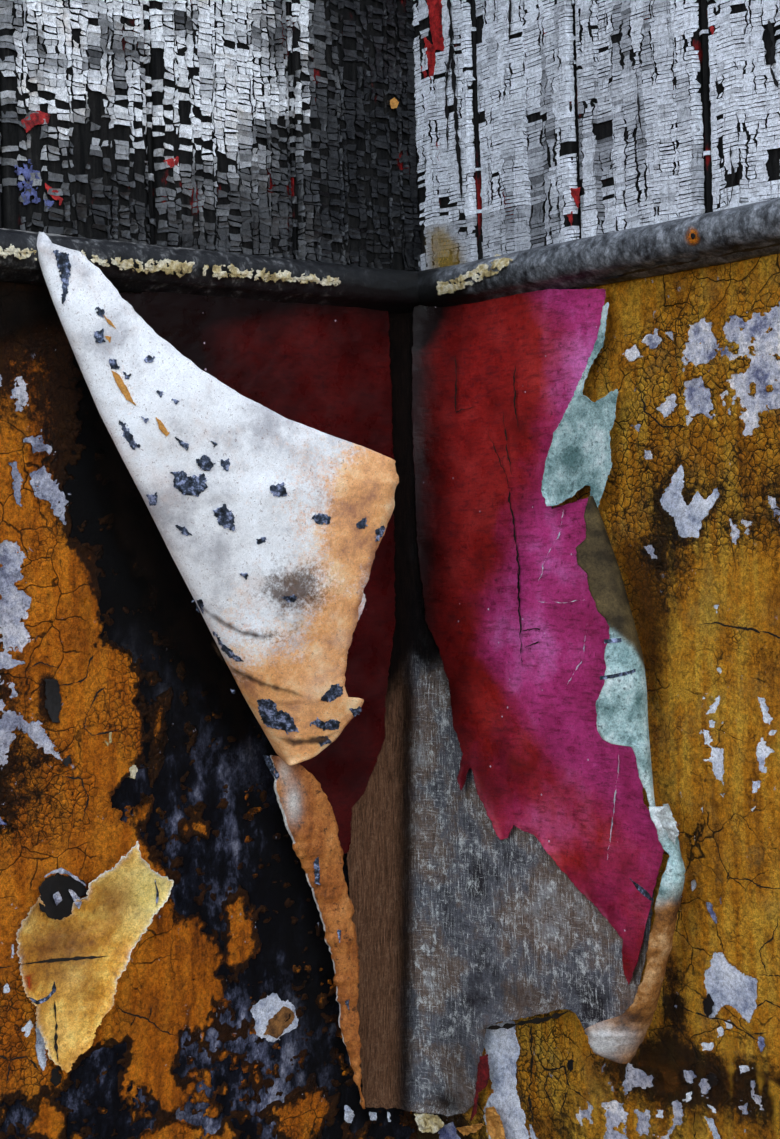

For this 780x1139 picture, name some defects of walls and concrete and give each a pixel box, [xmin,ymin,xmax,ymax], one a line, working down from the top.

peeling [421,0,445,82]
peeling [53,250,341,306]
peeling [120,291,394,460]
peeling [622,301,780,436]
peeling [660,465,720,538]
peeling [411,254,664,985]
crack [701,622,780,639]
spalling [0,353,538,1139]
peeling [699,696,725,797]
crack [727,863,780,889]
crack [679,918,780,1049]
peeling [576,1063,721,1139]